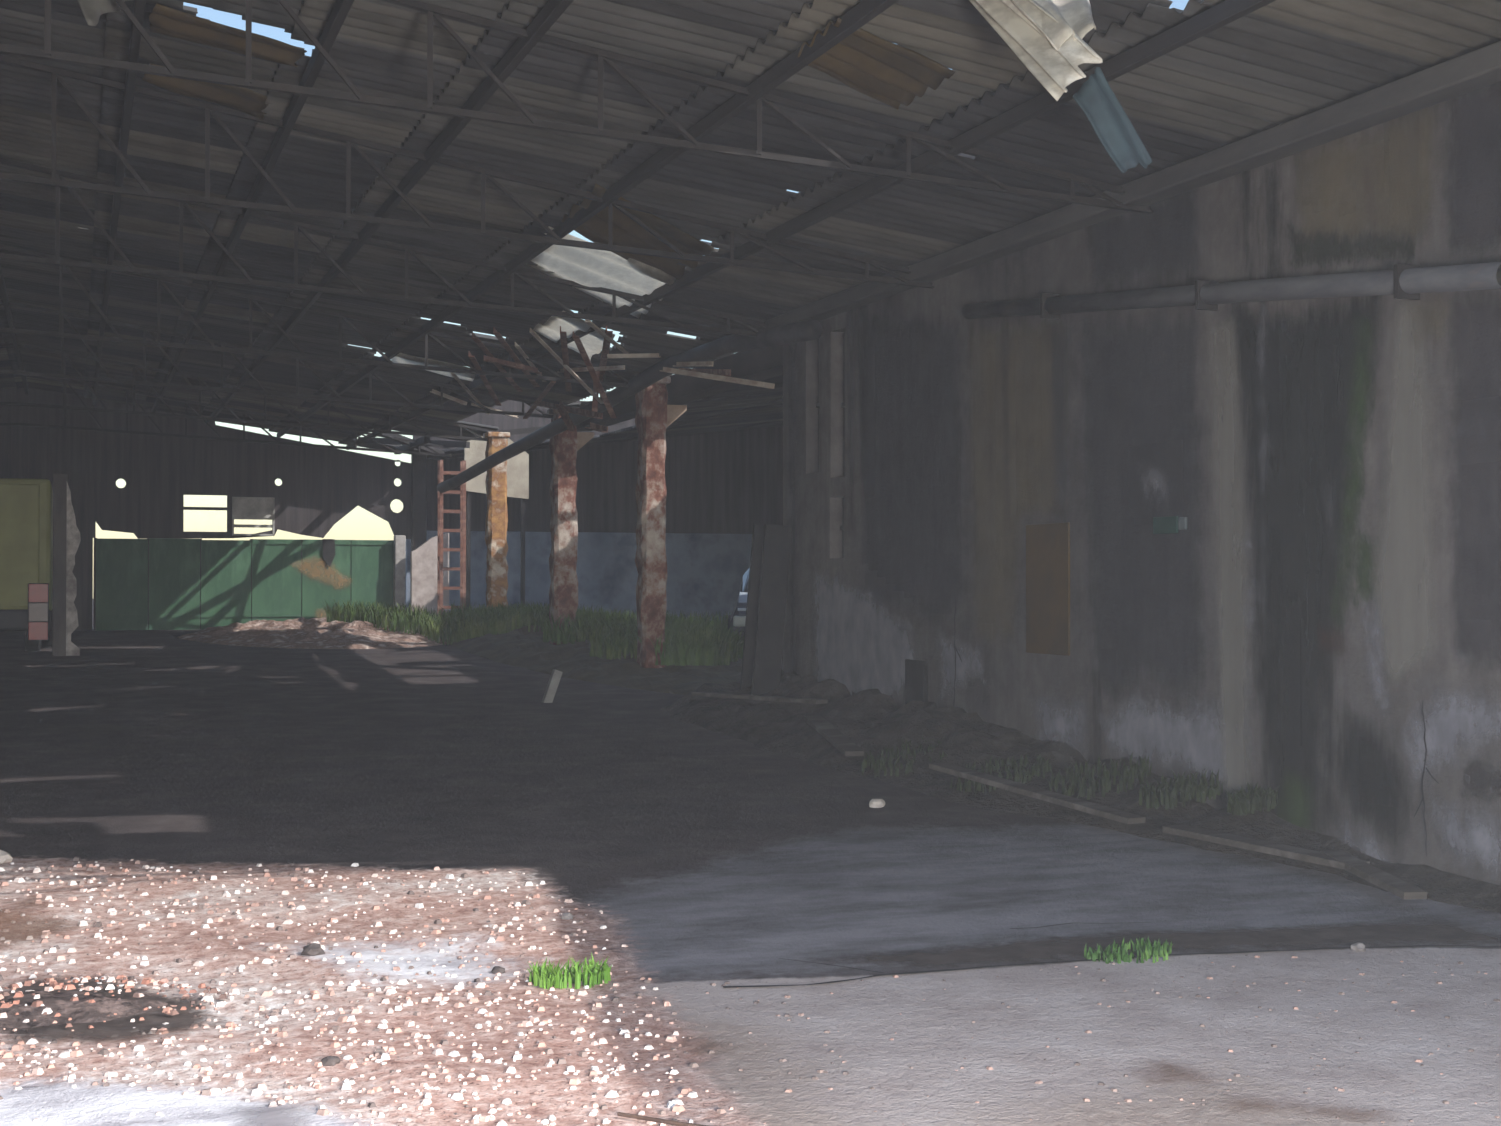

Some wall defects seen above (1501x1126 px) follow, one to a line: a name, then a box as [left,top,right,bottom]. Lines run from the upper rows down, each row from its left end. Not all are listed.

leakage [1211,295,1431,834]